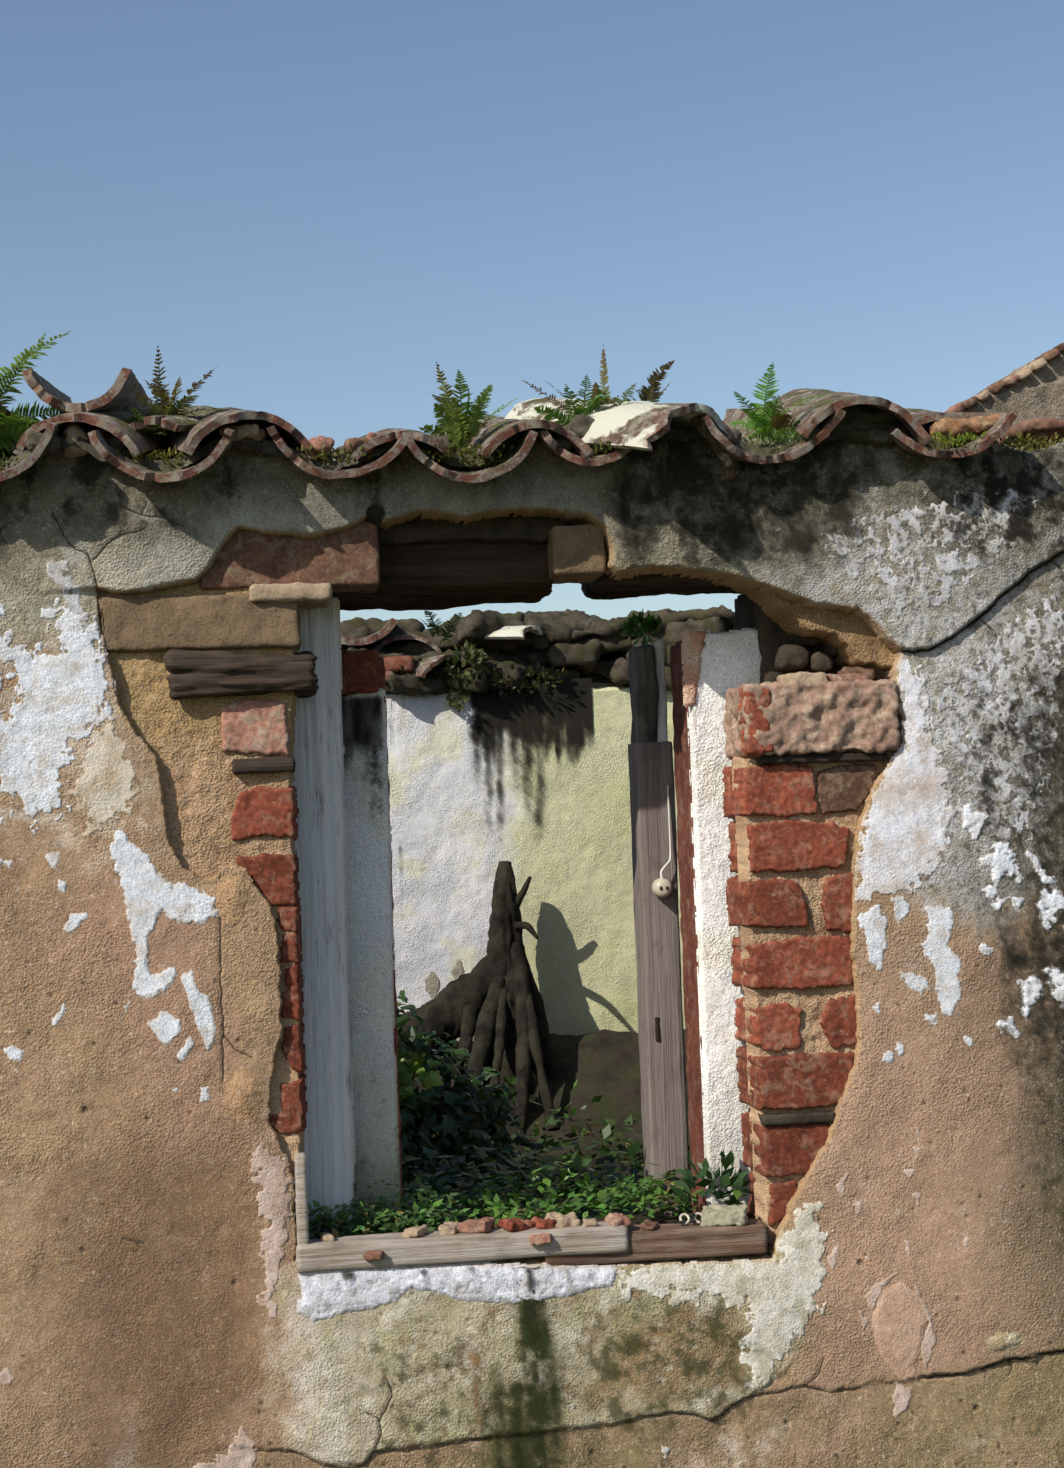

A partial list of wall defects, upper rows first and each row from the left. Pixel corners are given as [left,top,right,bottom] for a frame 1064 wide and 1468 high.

leakage [63,452,123,515]
crack [901,551,1064,653]
spalling [760,633,875,686]
leakage [469,678,594,825]
peeling [0,558,219,1062]
peeling [854,584,1064,1026]
leakage [965,675,1064,1039]
peeling [995,966,1064,1039]
leakage [520,1266,540,1341]
peeling [249,1141,840,1390]
crack [258,1379,509,1468]
crack [639,1357,861,1425]